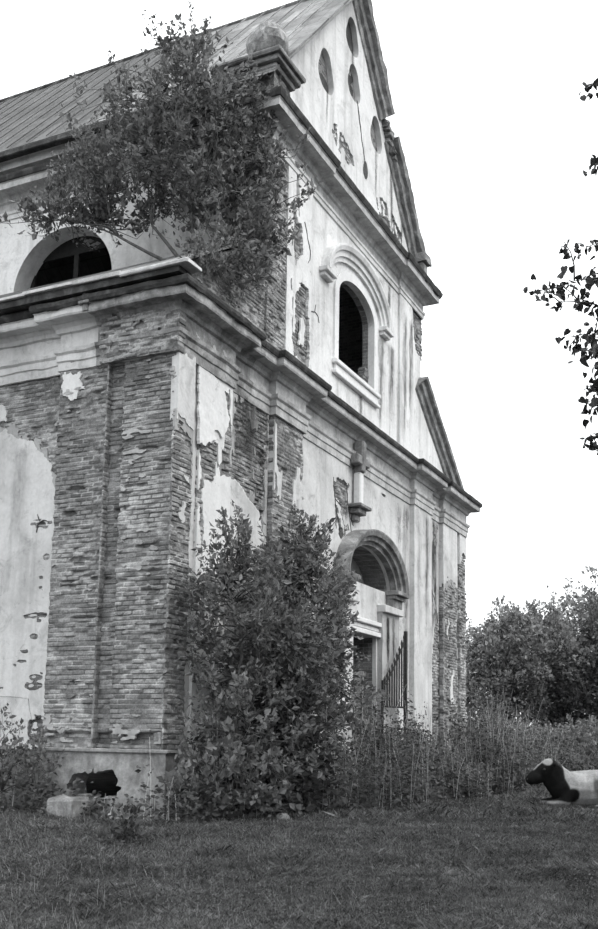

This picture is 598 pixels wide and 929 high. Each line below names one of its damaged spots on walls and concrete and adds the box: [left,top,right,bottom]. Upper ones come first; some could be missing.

flaking render [258,146,307,365]
flaking render [0,360,85,487]
spalling [24,672,43,691]
spalling [24,612,47,622]
flaking render [161,366,304,750]
flaking render [333,478,348,536]
flaking render [432,556,467,749]